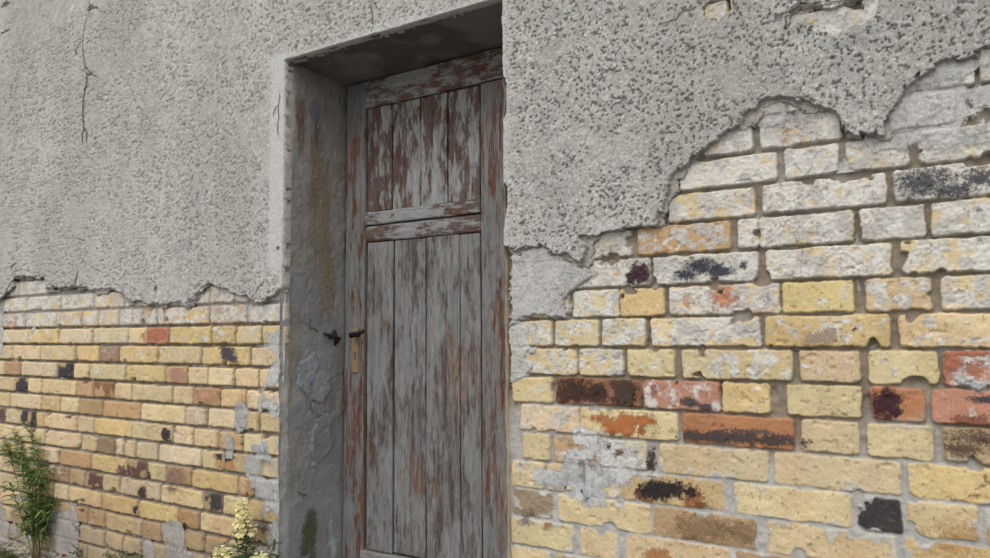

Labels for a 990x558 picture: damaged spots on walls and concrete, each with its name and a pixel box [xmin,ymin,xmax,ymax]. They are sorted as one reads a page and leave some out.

crack [75,0,98,144]
flaking render [506,43,990,383]
spalling [14,274,286,309]
flaking render [257,328,285,425]
peeling [296,352,332,408]
peeling [225,418,248,459]
flaking render [255,435,283,558]
peeling [566,425,616,499]
peeling [161,520,185,553]